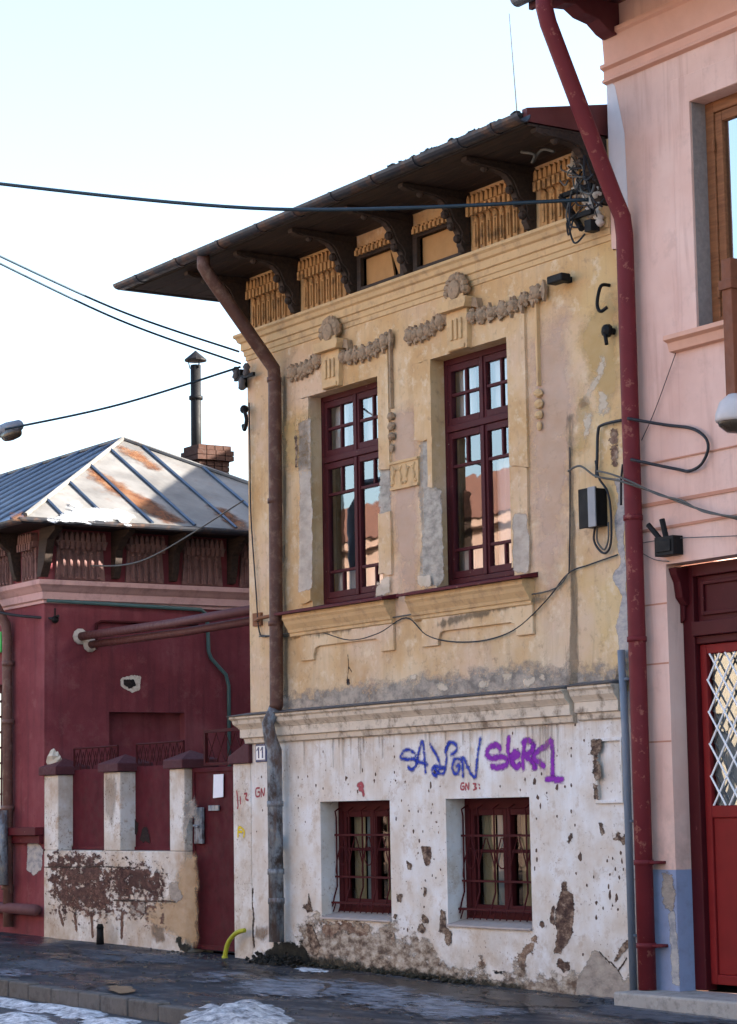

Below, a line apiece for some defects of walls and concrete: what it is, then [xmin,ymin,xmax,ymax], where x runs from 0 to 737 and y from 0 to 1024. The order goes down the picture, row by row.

corrosion [117,445,161,470]
corrosion [88,468,184,523]
spalling [378,469,392,514]
spalling [417,441,445,587]
spalling [512,513,529,573]
peeling [376,577,390,596]
water stain [282,487,619,710]
spalling [120,675,141,693]
spalling [583,738,602,799]
peeling [26,842,183,931]
peeling [297,770,630,998]